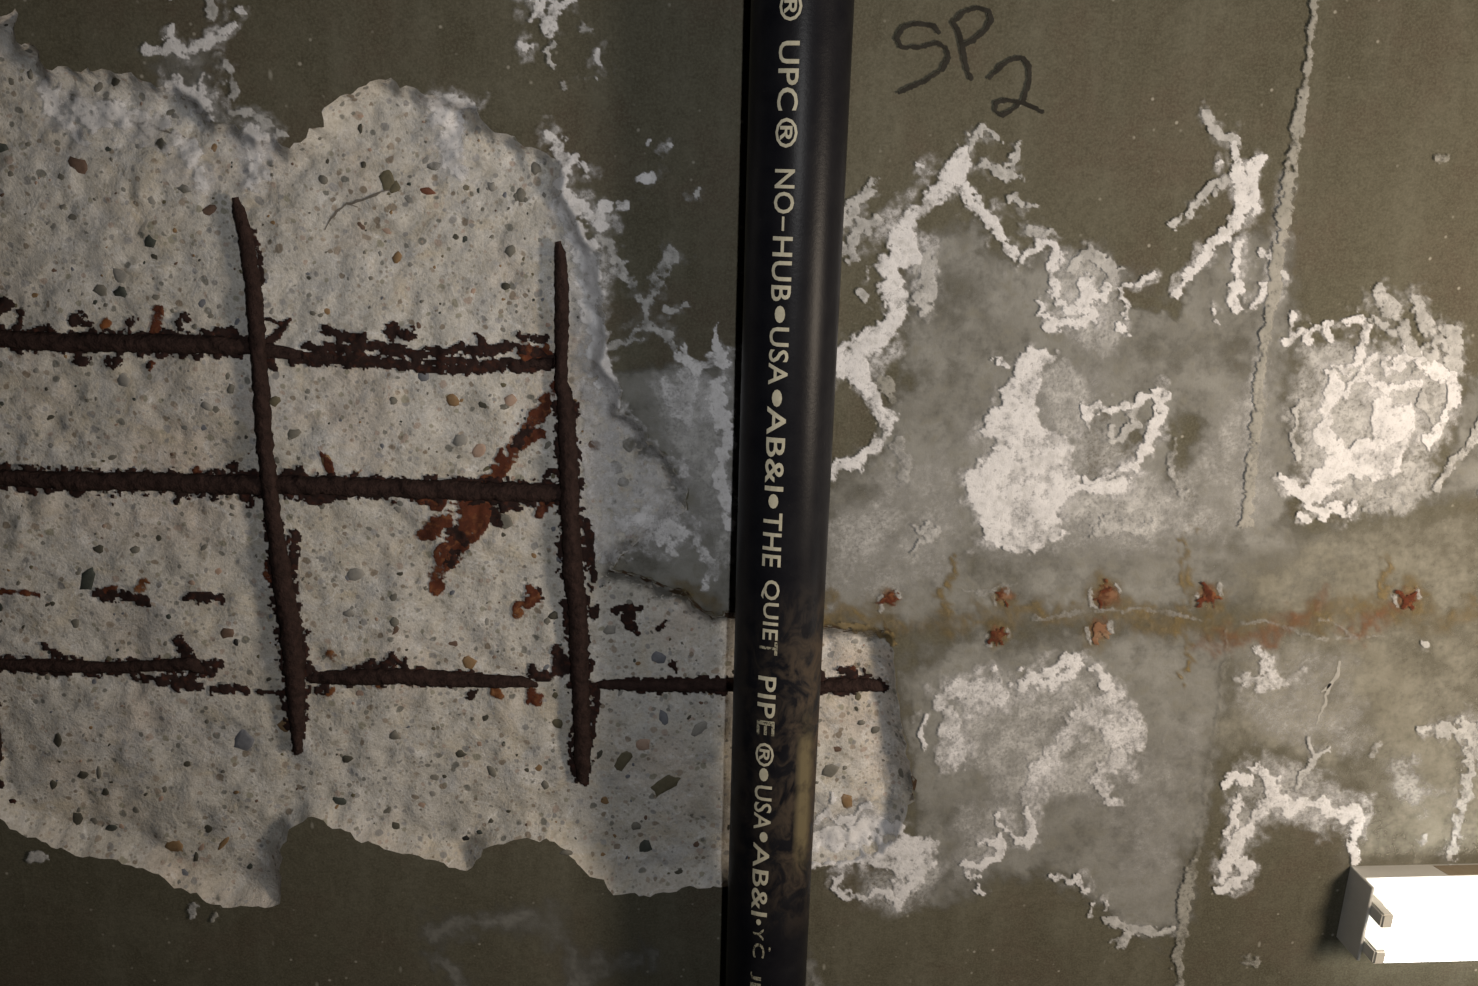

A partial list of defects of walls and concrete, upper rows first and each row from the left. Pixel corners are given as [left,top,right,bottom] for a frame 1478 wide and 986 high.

water stain [416,93,476,183]
water stain [544,126,742,620]
spalling [0,9,735,908]
rust [479,381,556,483]
rust [92,578,151,608]
rust [182,592,226,606]
rust [416,500,504,596]
rust [610,603,668,636]
crack [609,570,735,619]
crack [823,620,897,647]
water stain [811,109,1478,986]
spalling [812,625,915,867]